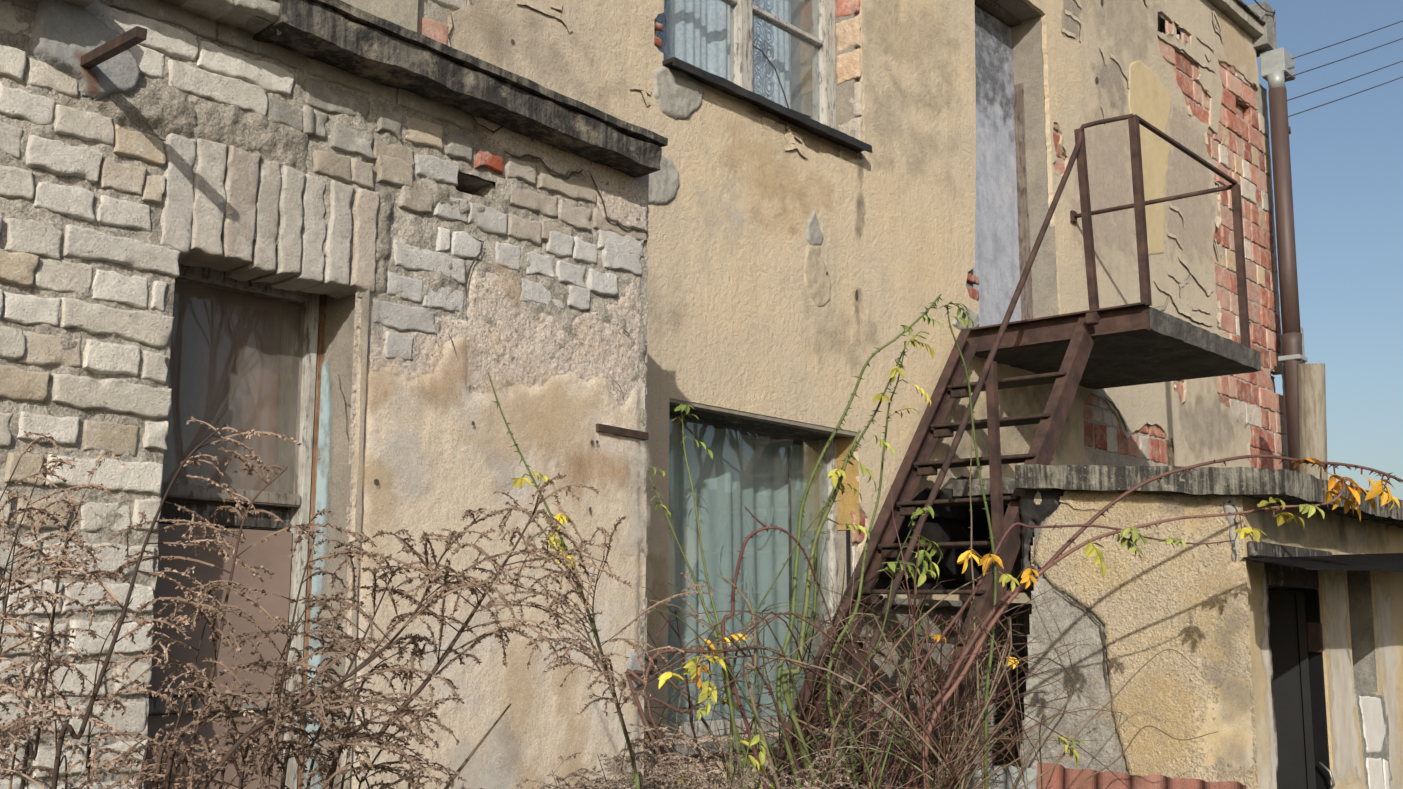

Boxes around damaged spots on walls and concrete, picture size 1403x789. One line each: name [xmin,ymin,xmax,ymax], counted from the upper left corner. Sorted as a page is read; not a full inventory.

flaking render [418,0,475,45]
flaking render [746,0,863,161]
flaking render [473,117,649,233]
flaking render [1158,10,1289,470]
flaking render [1080,388,1175,466]
flaking render [837,604,970,789]
flaking render [946,576,1126,774]